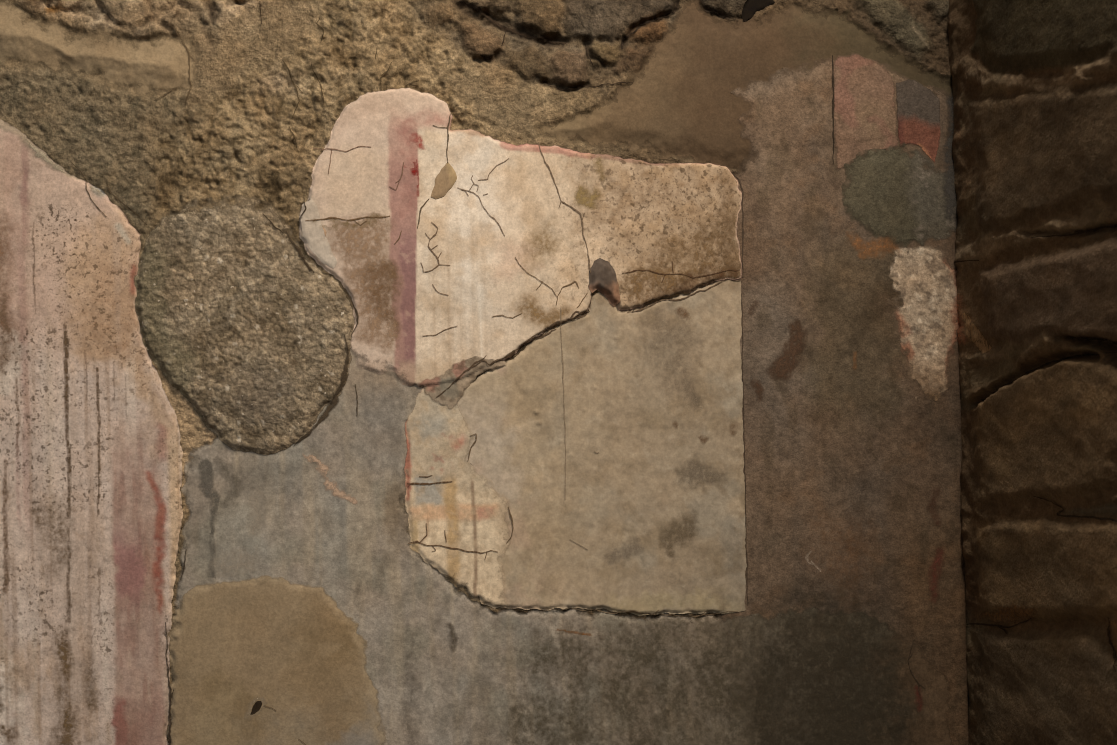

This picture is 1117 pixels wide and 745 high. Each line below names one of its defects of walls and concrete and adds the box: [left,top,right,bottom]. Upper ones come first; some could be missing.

spalling [431,162,457,199]
spalling [300,197,337,268]
crack [433,113,591,494]
crack [625,170,744,409]
spalling [889,246,992,401]
crack [407,475,452,485]
crack [408,507,513,558]